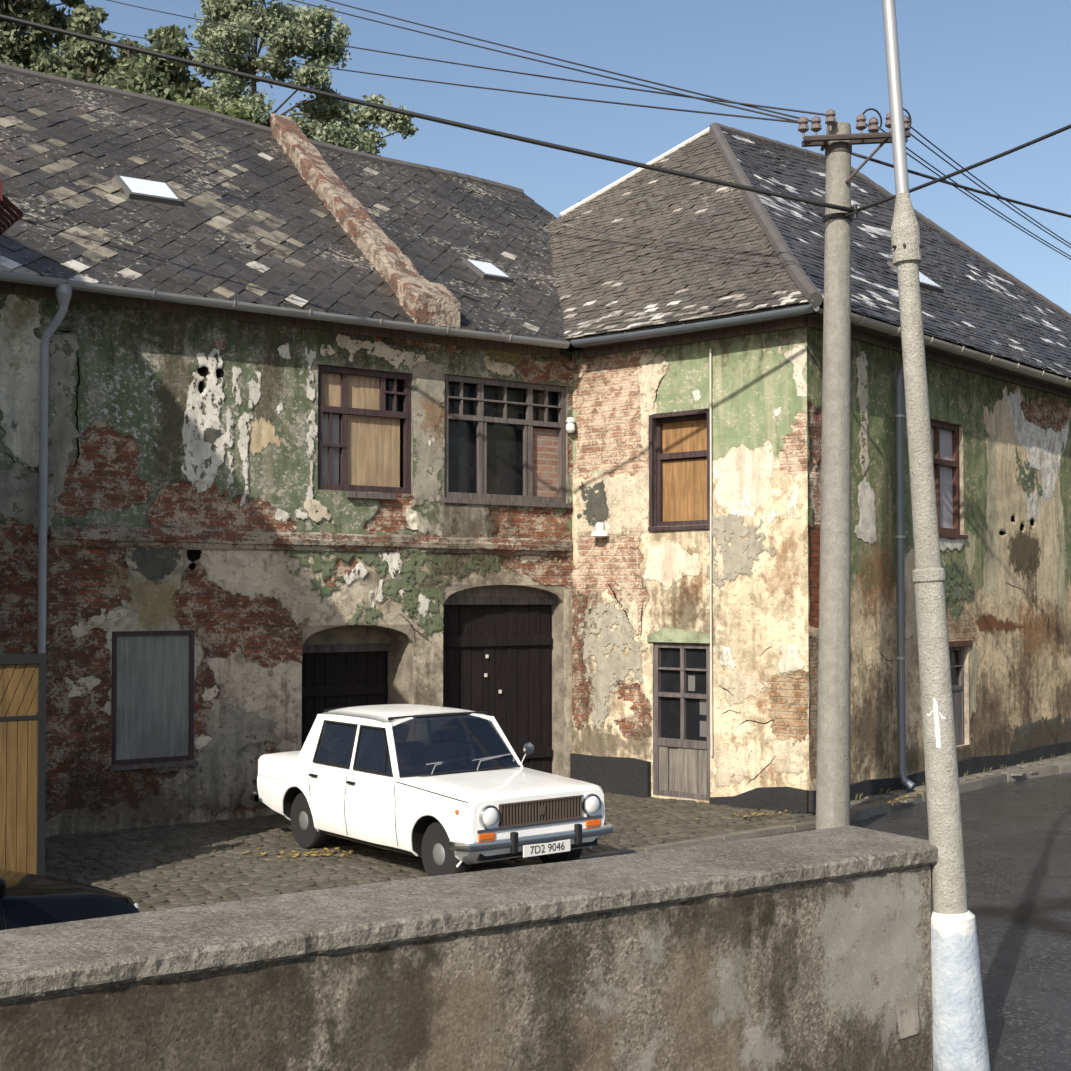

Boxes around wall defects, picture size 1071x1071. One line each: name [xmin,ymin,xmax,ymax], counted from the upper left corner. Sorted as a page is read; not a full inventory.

flaking render [0,294,822,821]
peeling [939,384,1071,718]
water stain [1007,527,1041,580]
water stain [906,741,925,774]
water stain [956,719,1071,761]